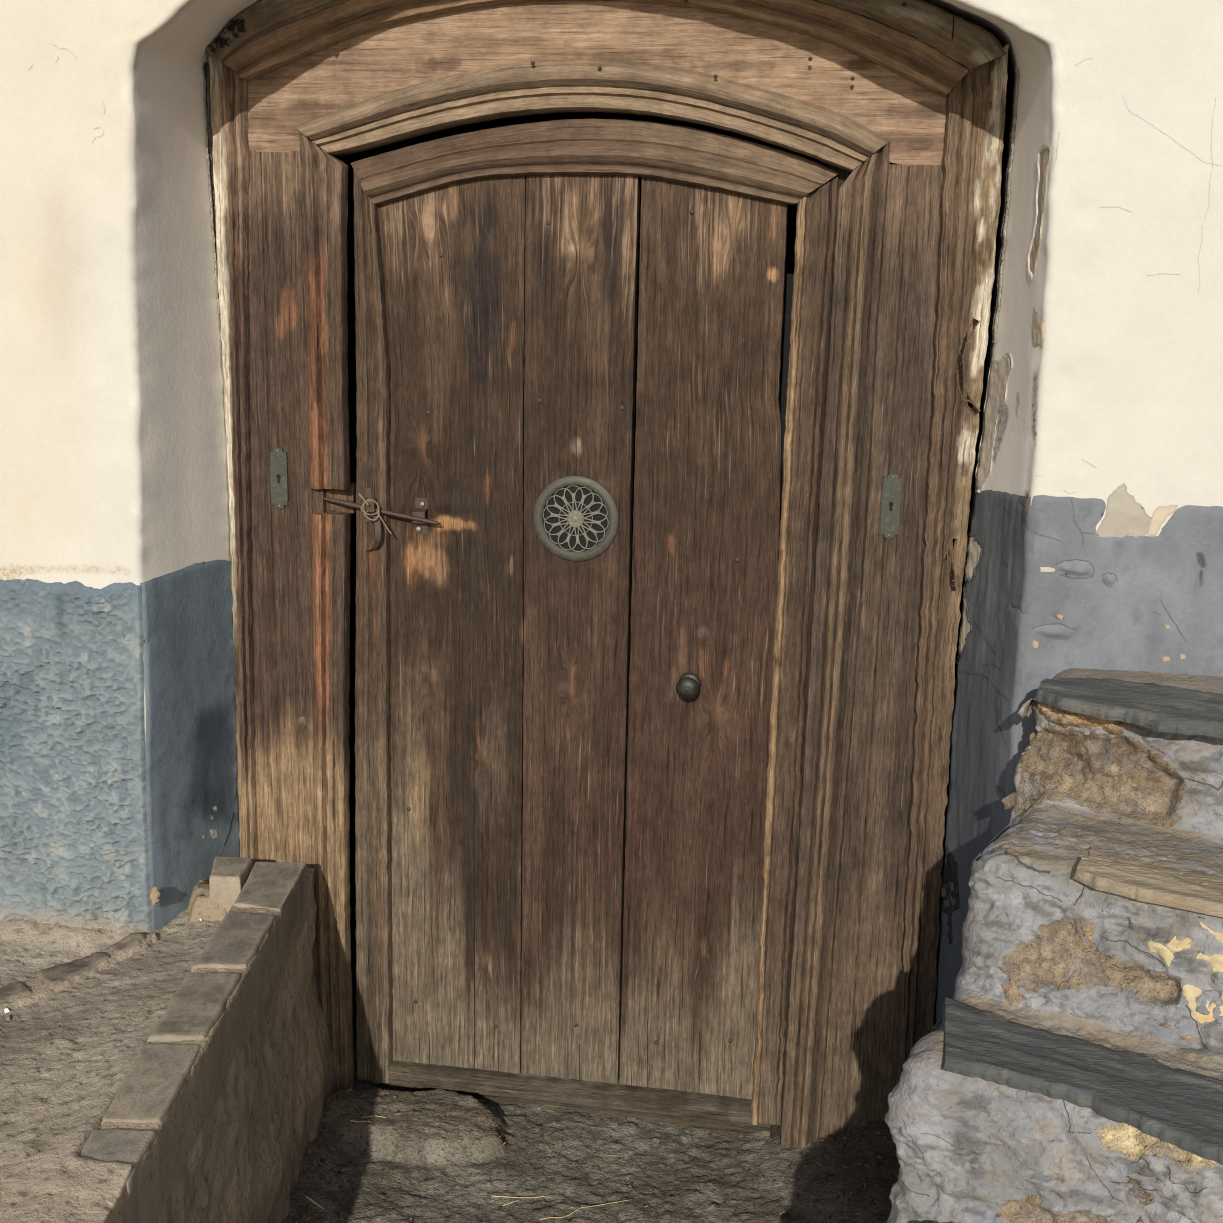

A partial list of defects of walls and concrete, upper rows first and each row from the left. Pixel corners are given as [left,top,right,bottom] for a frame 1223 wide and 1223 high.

peeling [1028,132,1060,280]
crack [1122,94,1223,293]
peeling [1032,309,1044,348]
peeling [957,318,1012,493]
peeling [1096,483,1178,538]
spalling [1002,700,1190,829]
spalling [998,916,1223,1025]
spalling [995,1195,1118,1223]
spalling [1093,1123,1219,1223]